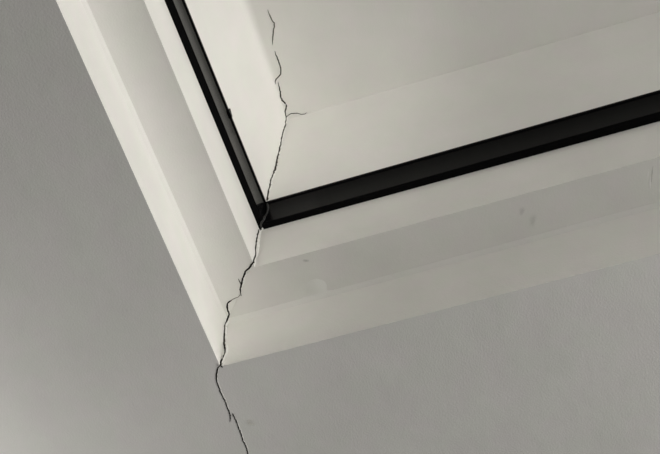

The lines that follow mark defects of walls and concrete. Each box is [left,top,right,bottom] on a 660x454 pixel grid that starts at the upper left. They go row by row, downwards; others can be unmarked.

crack [266,11,306,201]
crack [216,229,262,454]